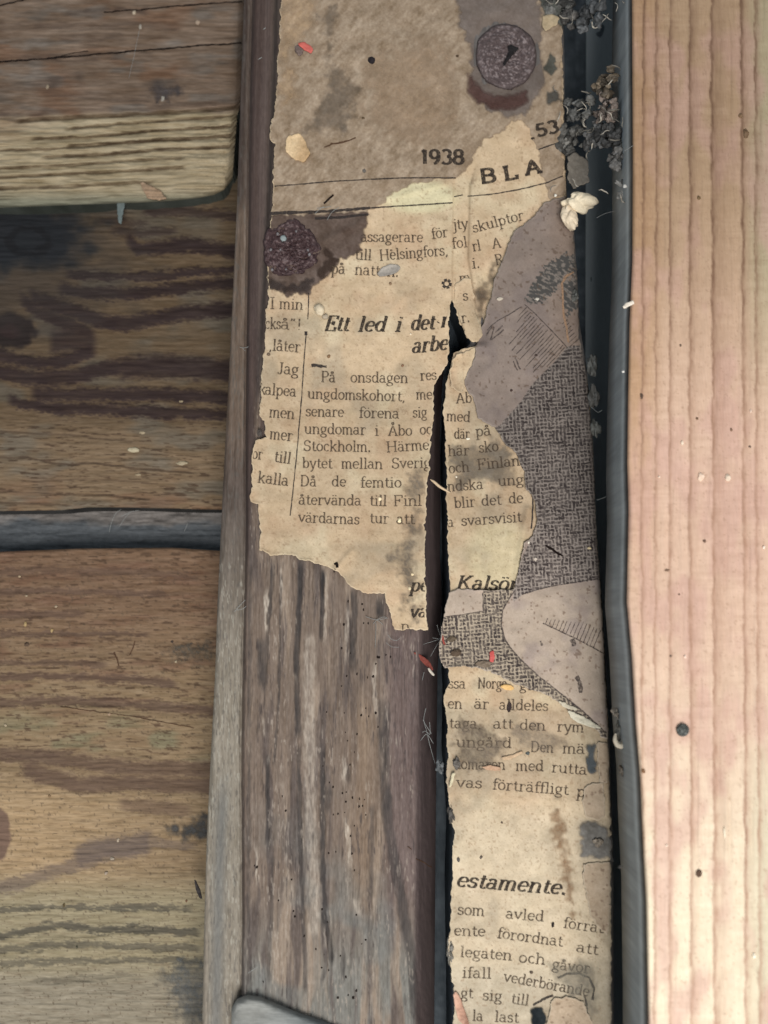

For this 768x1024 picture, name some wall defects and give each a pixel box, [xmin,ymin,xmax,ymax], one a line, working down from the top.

leakage [553,810,566,848]